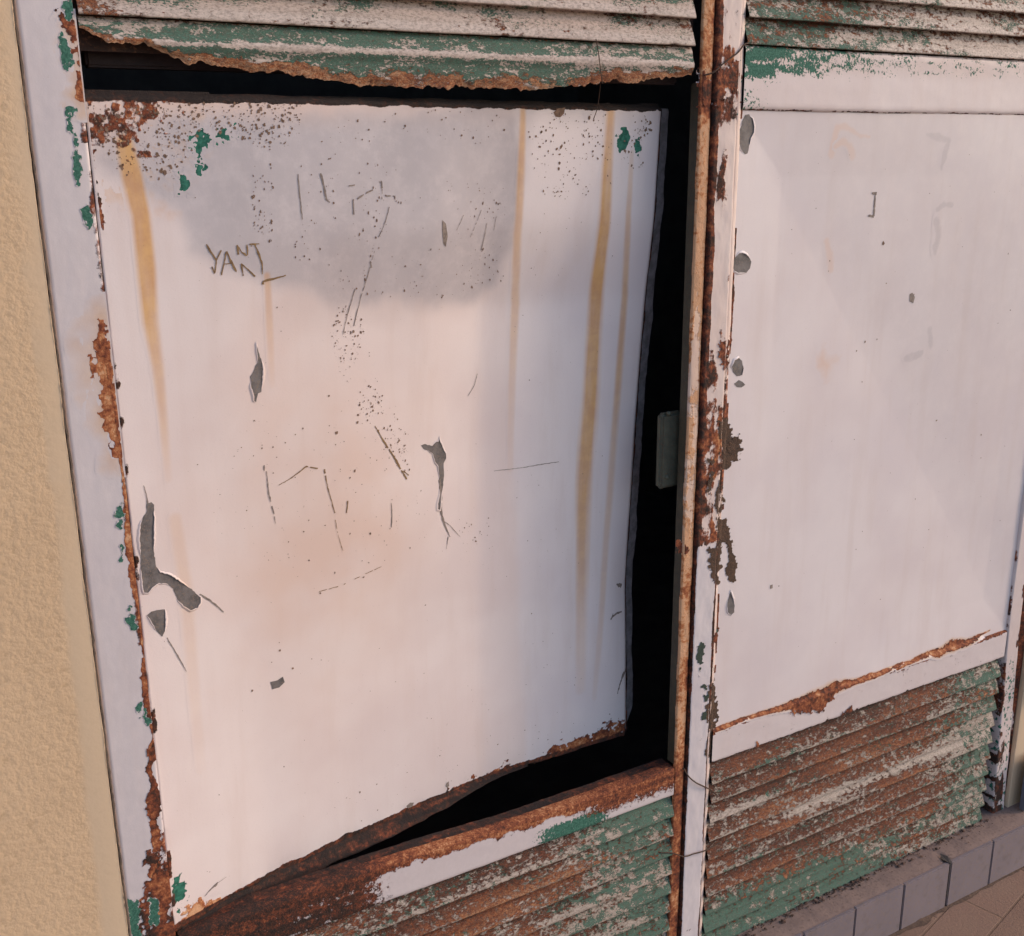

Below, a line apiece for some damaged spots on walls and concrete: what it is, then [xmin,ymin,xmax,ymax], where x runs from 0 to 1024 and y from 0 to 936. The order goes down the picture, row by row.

peeling [739,114,756,154]
corrosion [47,8,301,484]
peeling [733,251,751,275]
peeling [249,342,265,402]
corrosion [436,102,652,702]
peeling [730,356,745,387]
corrosion [63,292,233,936]
peeling [118,487,224,612]
peeling [421,436,457,549]
corrosion [706,417,744,585]
corrosion [705,628,991,758]
corrosion [262,711,627,879]